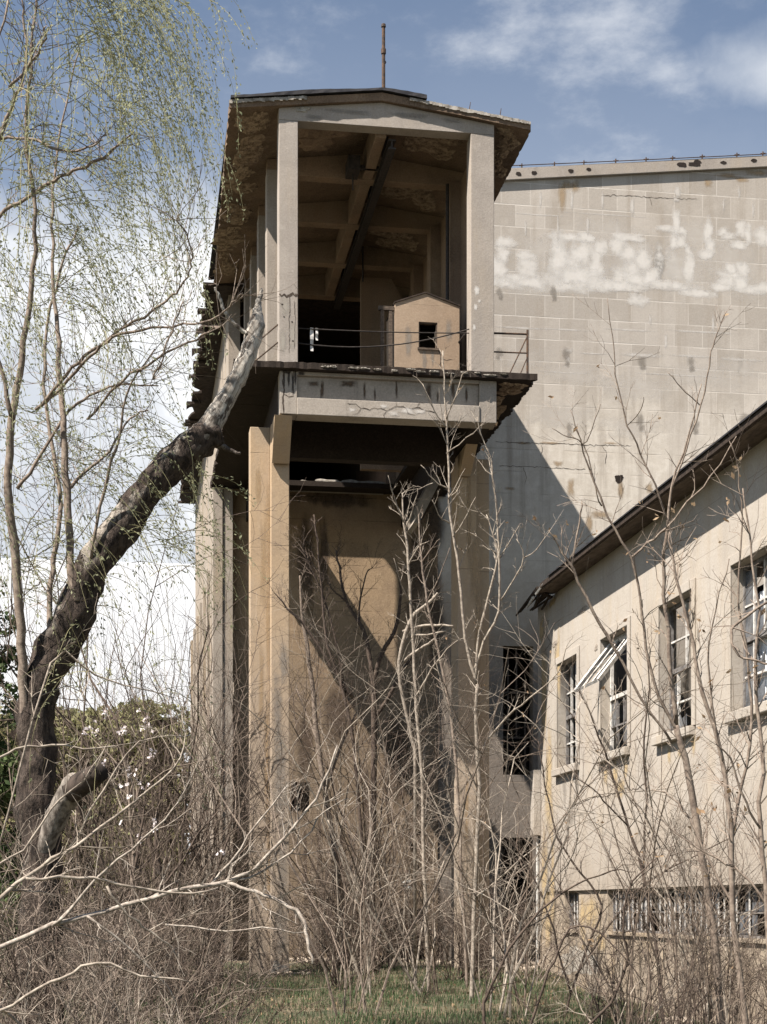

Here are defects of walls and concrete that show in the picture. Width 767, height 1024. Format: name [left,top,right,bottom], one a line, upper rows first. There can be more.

peeling [210,111,272,251]
peeling [494,128,537,179]
damp [494,187,767,305]
crack [348,402,435,418]